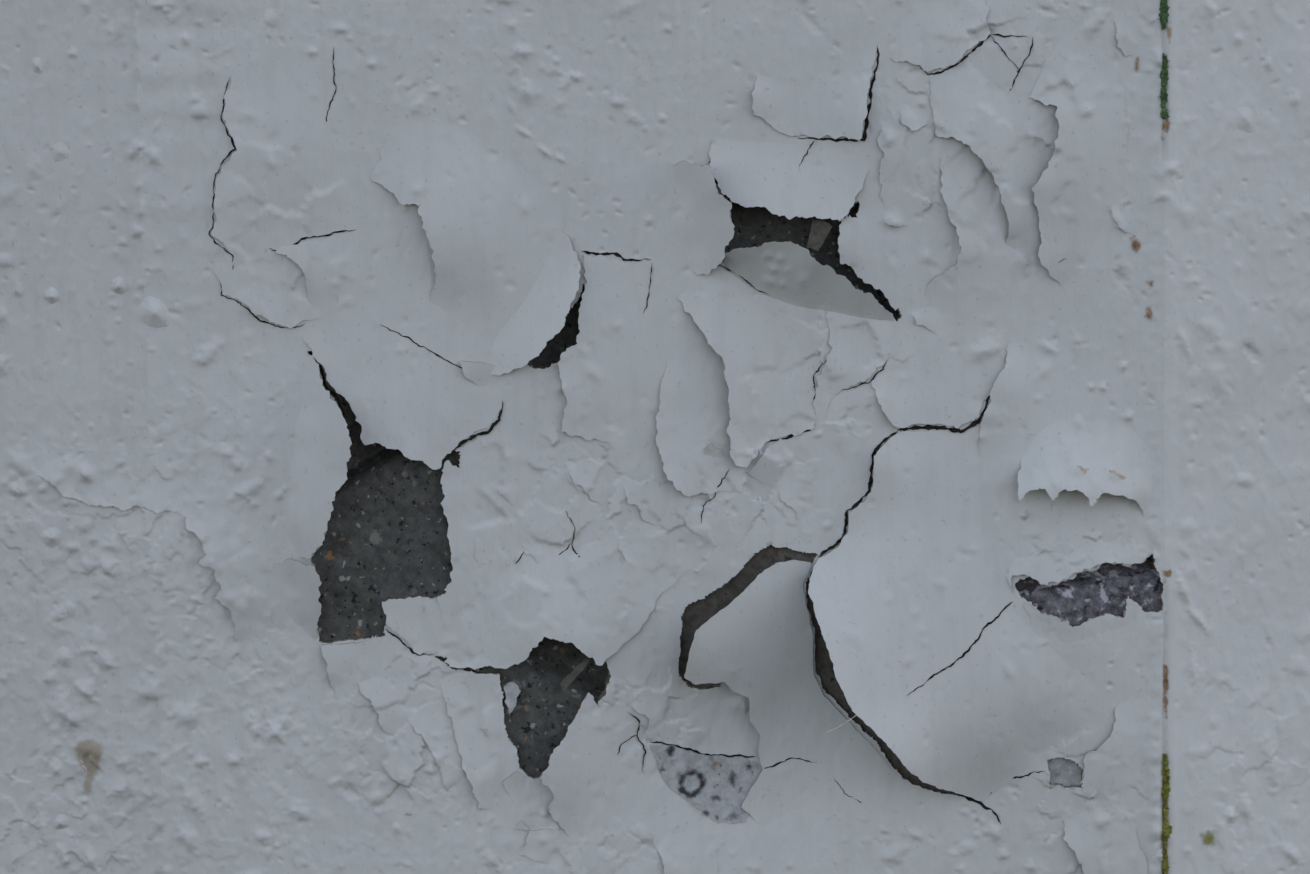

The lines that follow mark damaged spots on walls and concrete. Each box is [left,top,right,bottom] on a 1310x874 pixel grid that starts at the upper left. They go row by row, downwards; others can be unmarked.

crack [326,49,336,122]
peeling [210,0,1162,841]
peeling [35,451,278,642]
peeling [1047,691,1168,874]